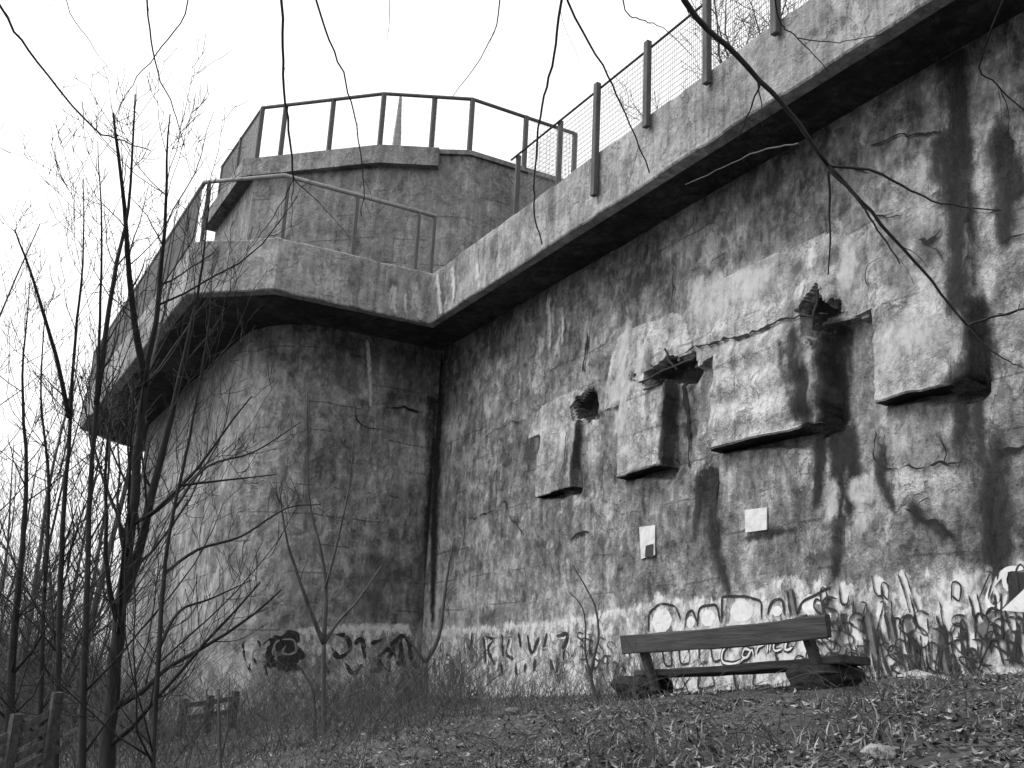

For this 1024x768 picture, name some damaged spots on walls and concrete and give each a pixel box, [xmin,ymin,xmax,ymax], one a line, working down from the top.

crack [685,315,812,357]
spalling [794,287,844,342]
damp [926,48,1024,574]
damp [424,358,444,627]
spalling [574,348,704,441]
damp [658,376,691,469]
damp [692,458,733,597]
damp [777,315,893,580]
crack [872,431,963,470]
damp [906,499,945,538]